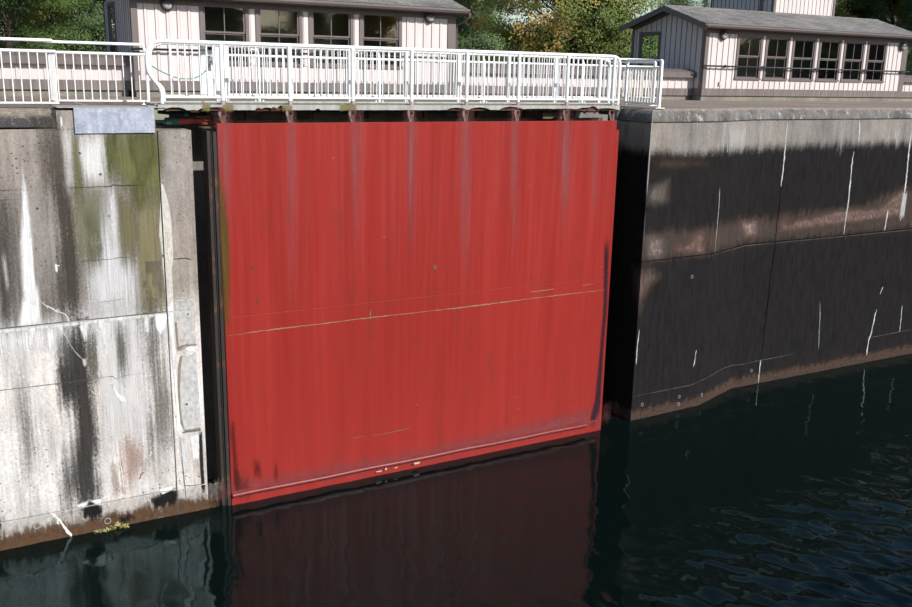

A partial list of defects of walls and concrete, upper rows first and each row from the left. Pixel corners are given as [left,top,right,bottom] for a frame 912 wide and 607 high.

leakage [0,112,207,538]
corrosion [0,496,217,551]
leakage [591,121,912,421]
corrosion [604,343,912,421]